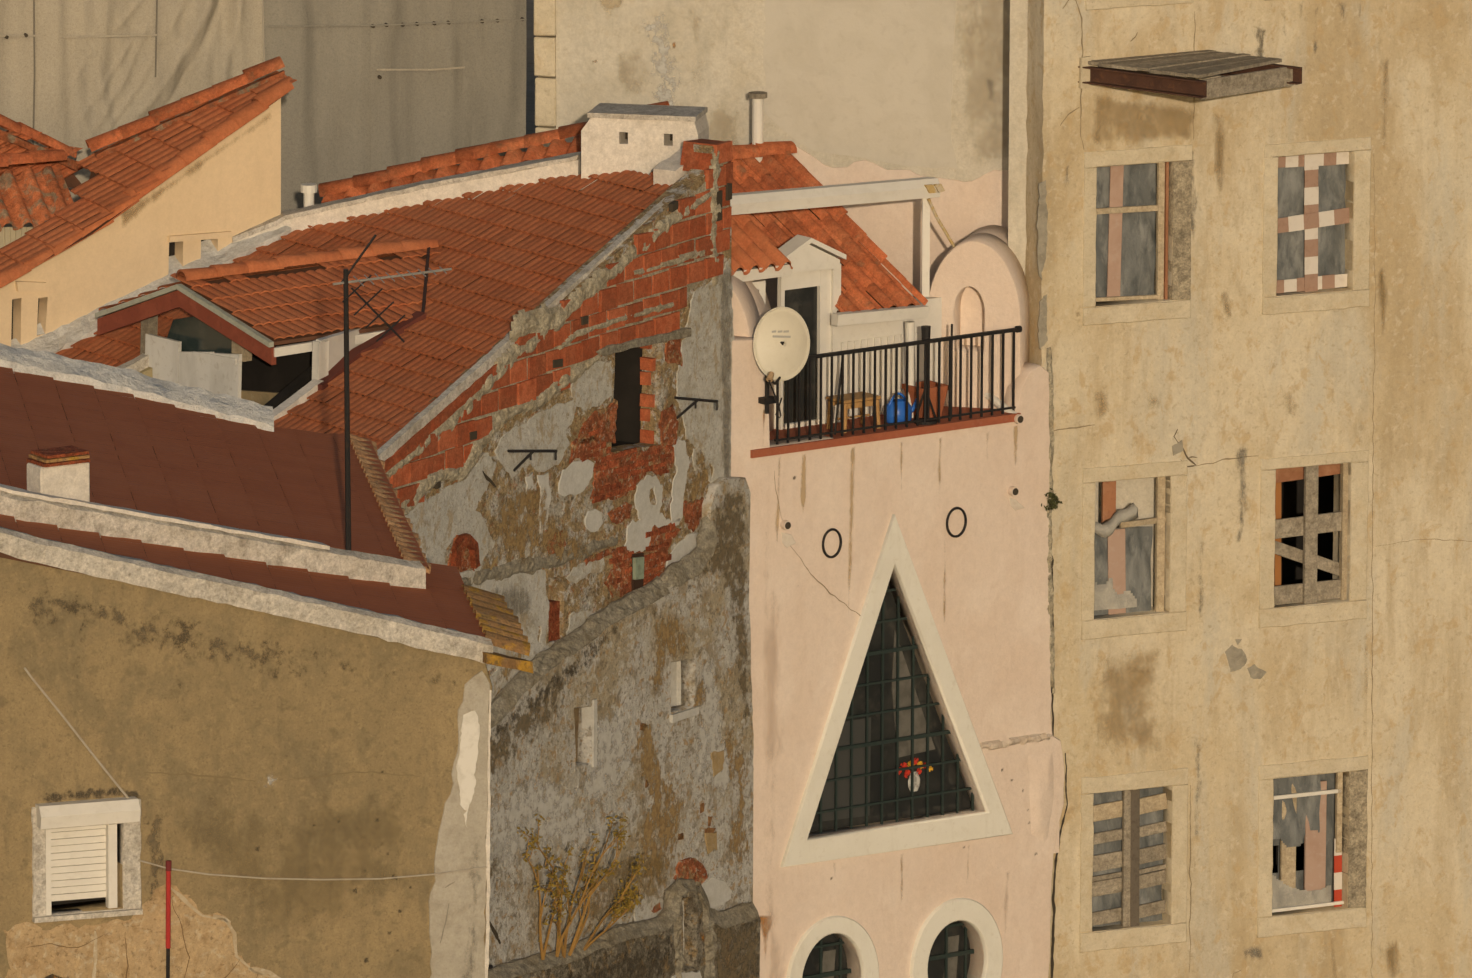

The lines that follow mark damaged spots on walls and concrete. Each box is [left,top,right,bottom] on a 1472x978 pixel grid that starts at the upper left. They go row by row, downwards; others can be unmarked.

flaking render [389,141,745,978]
crack [774,471,861,616]
damp [29,599,301,677]
peeling [3,884,281,978]
crack [1186,785,1194,970]